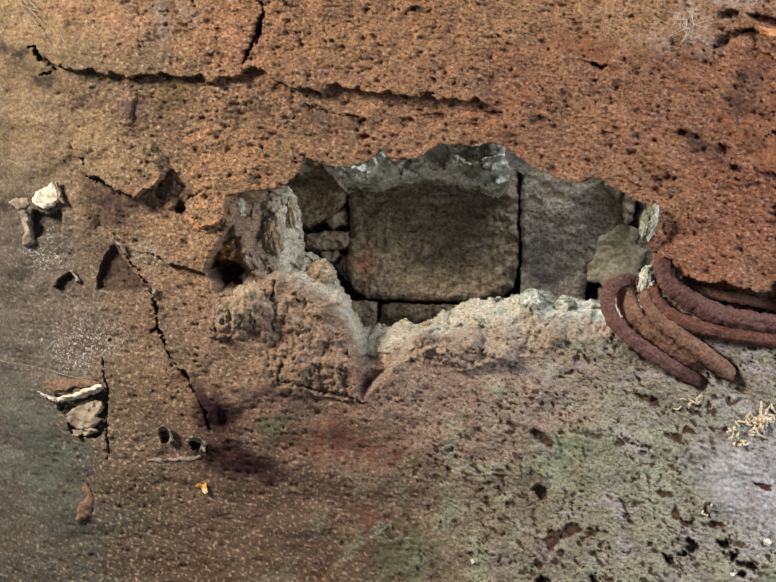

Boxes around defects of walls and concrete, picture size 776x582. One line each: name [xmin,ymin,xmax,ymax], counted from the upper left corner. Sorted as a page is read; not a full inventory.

crack [29,46,57,75]
crack [243,1,265,64]
crack [78,157,121,194]
spalling [322,143,538,198]
peeling [9,182,67,247]
spalling [97,236,158,297]
crack [128,258,211,429]
spalling [204,187,615,402]
corrosion [600,253,776,387]
peeling [37,377,109,438]
crack [102,360,110,459]
leakage [706,450,776,537]